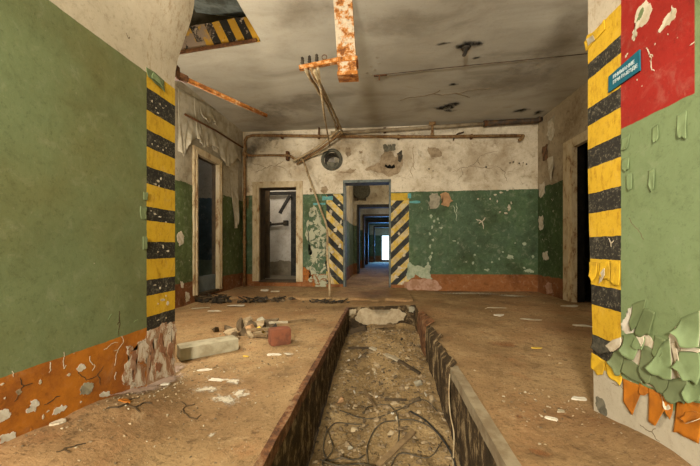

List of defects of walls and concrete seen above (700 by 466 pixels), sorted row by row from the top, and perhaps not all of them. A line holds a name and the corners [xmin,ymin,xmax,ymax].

peeling [632,0,653,41]
peeling [658,6,677,35]
peeling [178,88,242,228]
flaking render [338,144,403,177]
peeling [305,206,342,287]
peeling [395,192,453,291]
peeling [0,409,11,422]
peeling [26,399,50,419]
flaking render [122,318,177,389]
spalling [277,306,418,466]
spalling [432,376,497,466]
peeling [590,299,700,444]